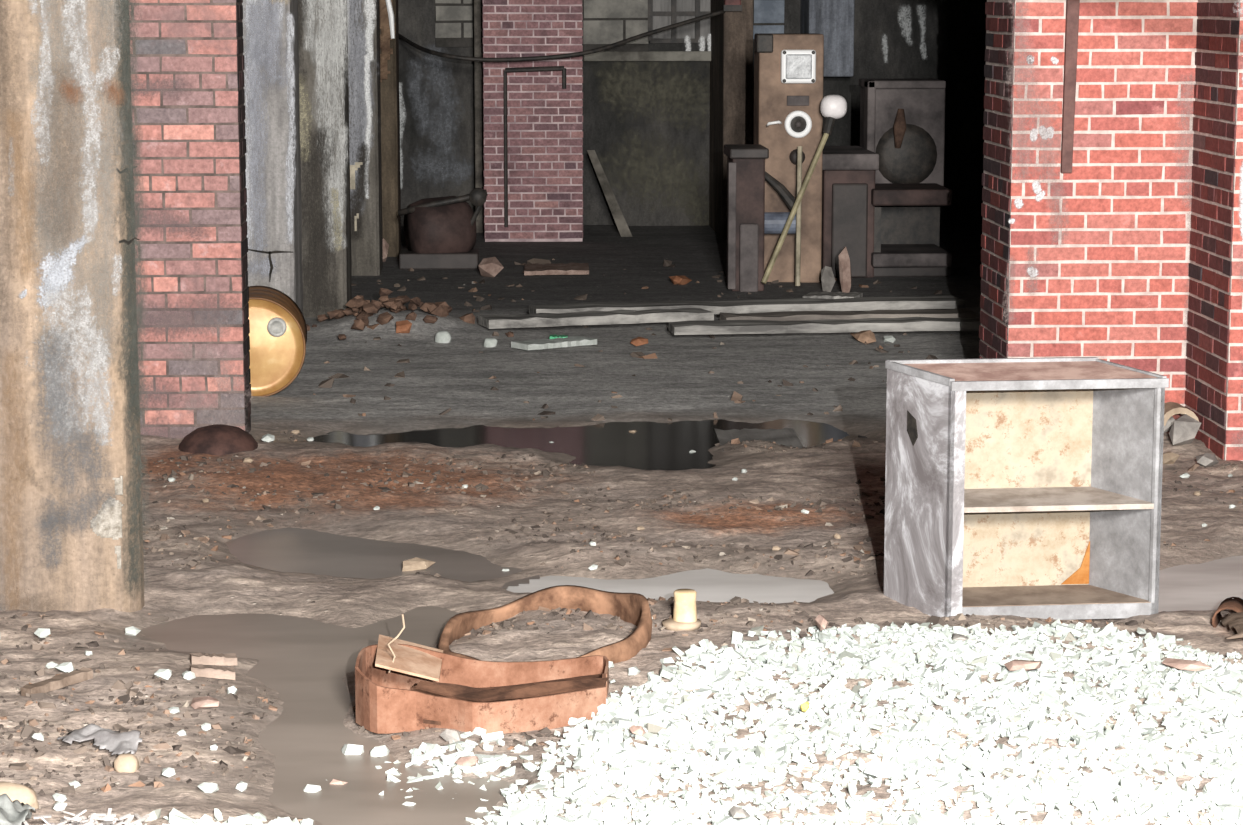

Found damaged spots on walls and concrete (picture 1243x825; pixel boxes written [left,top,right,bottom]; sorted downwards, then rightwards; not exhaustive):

water stain [19,0,234,590]
water stain [244,0,376,315]
water stain [399,46,471,186]
water stain [685,35,711,51]